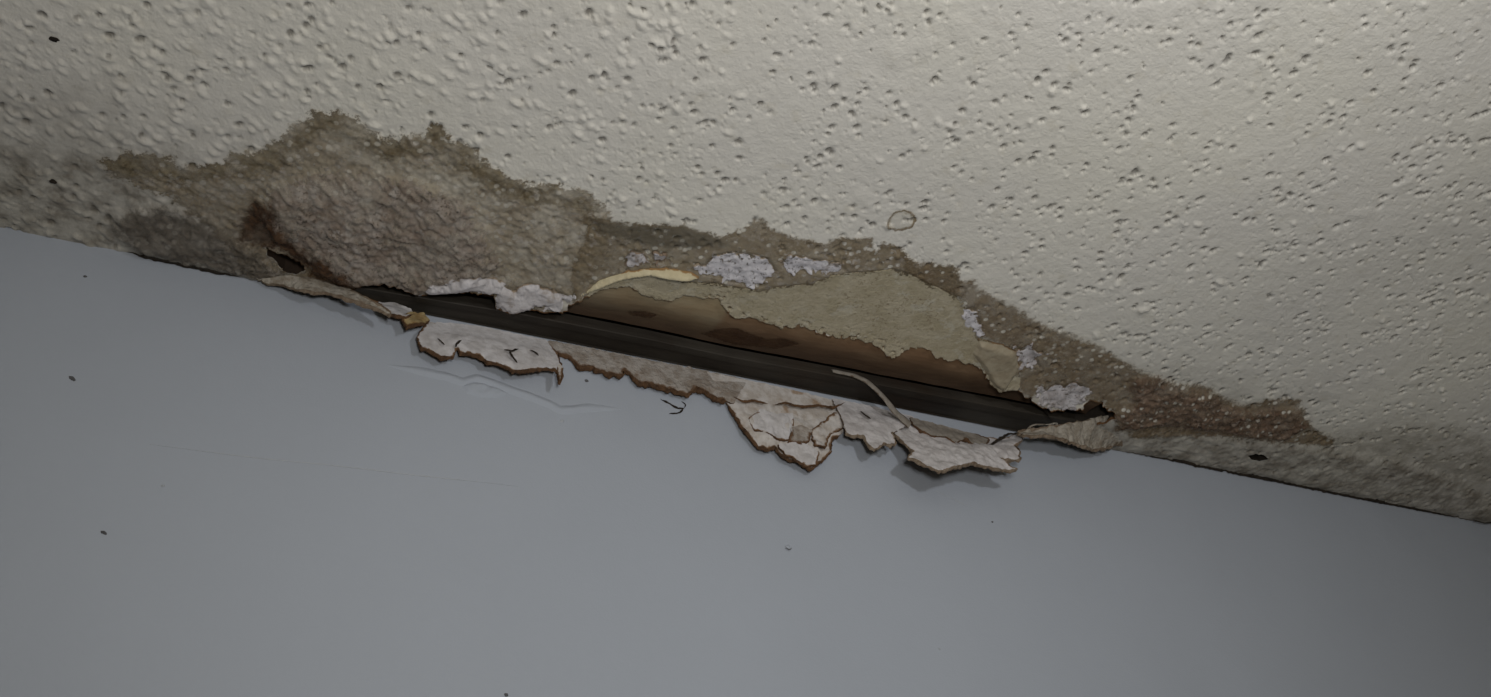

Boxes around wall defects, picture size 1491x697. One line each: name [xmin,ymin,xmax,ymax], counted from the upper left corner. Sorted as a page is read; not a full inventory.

peeling [257,250,1123,474]
water stain [100,109,1335,446]